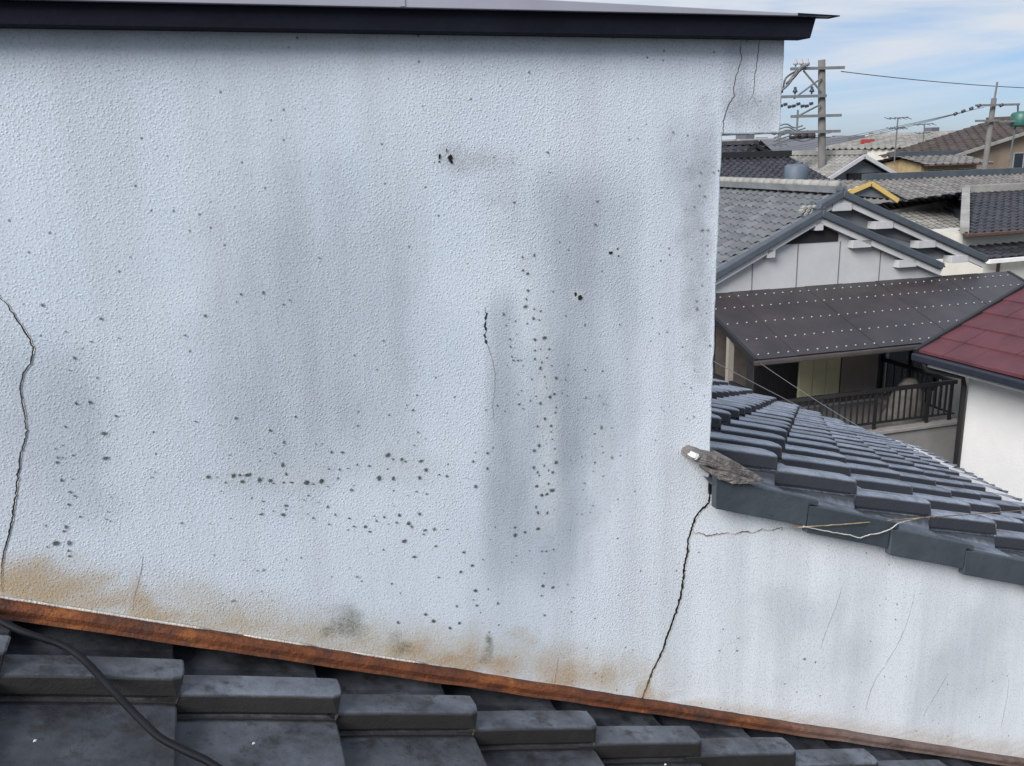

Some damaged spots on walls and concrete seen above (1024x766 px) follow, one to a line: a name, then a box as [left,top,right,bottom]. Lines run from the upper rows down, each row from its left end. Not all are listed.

crack [722,41,760,131]
crack [0,296,35,589]
damp [221,441,448,543]
crack [483,312,496,418]
damp [503,313,568,514]
crack [642,483,788,698]